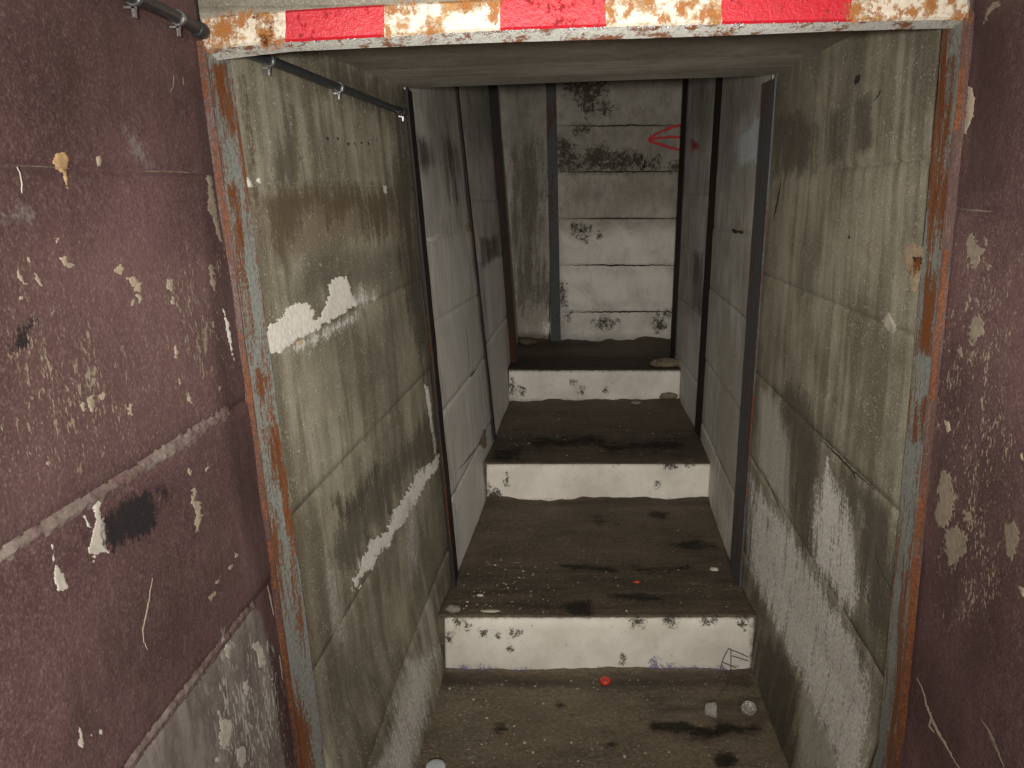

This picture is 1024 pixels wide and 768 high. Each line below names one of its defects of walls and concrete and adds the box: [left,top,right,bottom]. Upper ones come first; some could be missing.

rust [460,0,504,25]
rust [603,0,722,25]
leakage [557,81,679,175]
peeling [52,152,69,189]
rust [844,0,973,444]
peeling [114,264,142,306]
rust [203,8,285,520]
peeling [203,309,234,359]
leakage [591,314,621,332]
leakage [650,309,892,768]
peeling [934,469,973,567]
leakage [562,600,592,616]